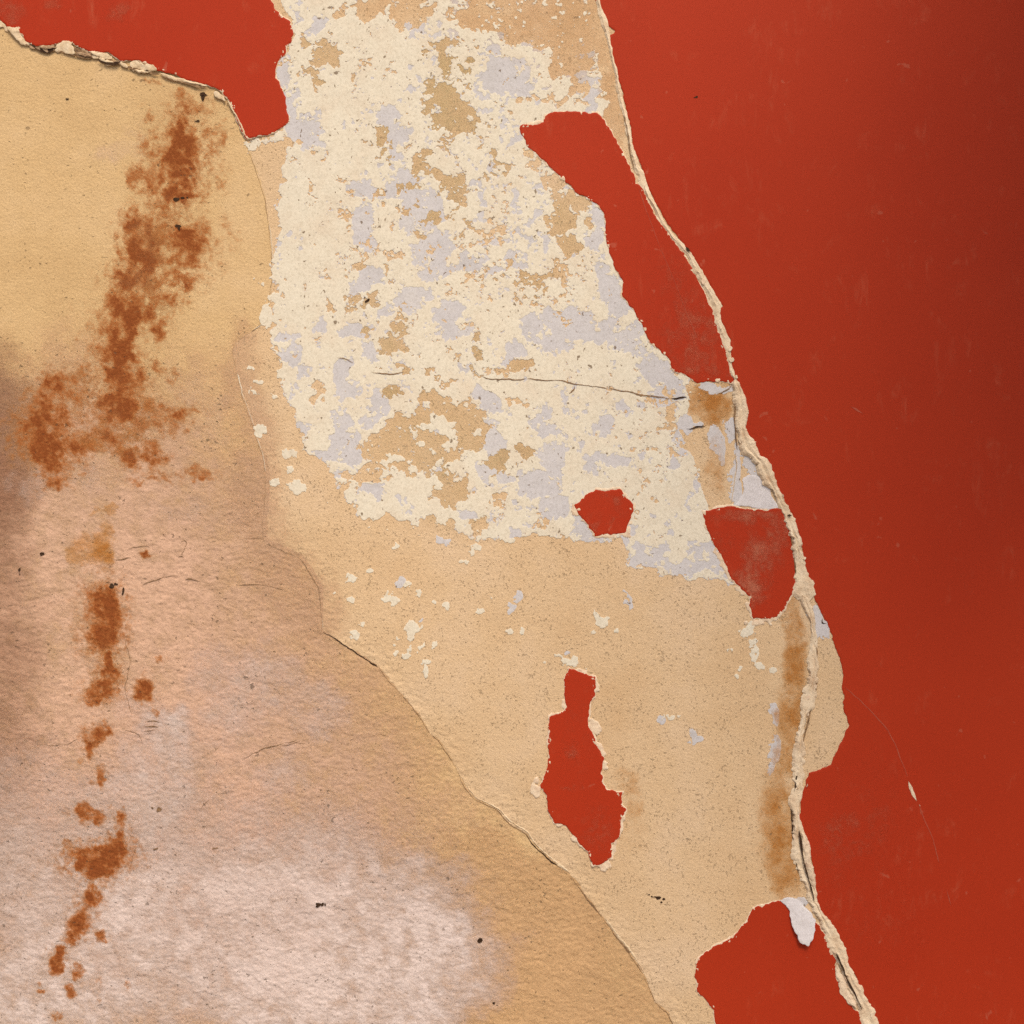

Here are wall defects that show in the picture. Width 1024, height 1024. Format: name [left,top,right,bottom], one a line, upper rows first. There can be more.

corrosion [7,88,227,491]
spalling [0,23,272,506]
corrosion [71,530,113,563]
crack [0,21,687,1024]
peeling [233,0,821,1024]
corrosion [78,720,113,759]
corrosion [97,768,106,787]
corrosion [76,584,128,707]
corrosion [133,679,159,716]
peeling [803,597,849,787]
corrosion [49,801,137,998]